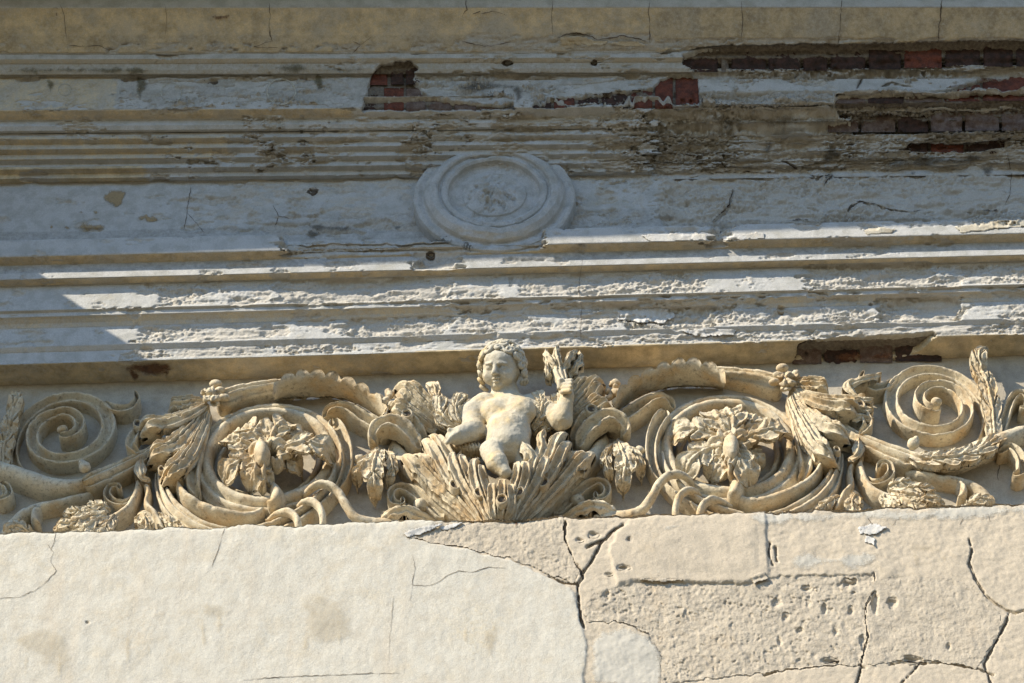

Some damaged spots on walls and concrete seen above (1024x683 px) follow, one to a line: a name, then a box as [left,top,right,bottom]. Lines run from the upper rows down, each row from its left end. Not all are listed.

flaking render [362,61,515,113]
flaking render [533,39,1024,154]
flaking render [618,308,675,324]
flaking render [682,328,736,337]
flaking render [792,337,942,364]
crack [551,522,622,627]
crack [828,573,875,683]
crack [953,519,1009,683]